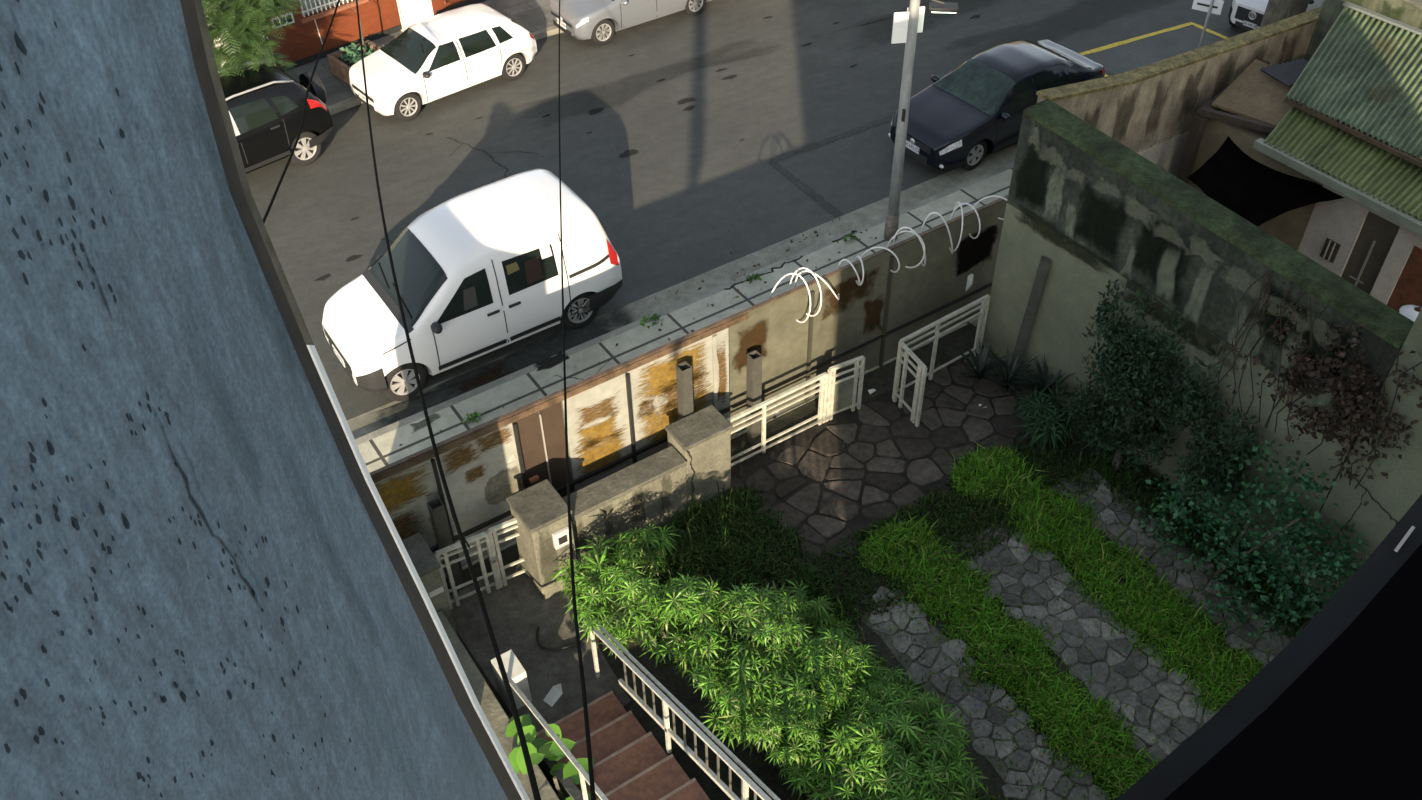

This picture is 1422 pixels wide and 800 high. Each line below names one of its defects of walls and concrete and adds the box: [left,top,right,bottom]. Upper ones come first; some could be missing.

crack [82,244,110,313]
corrosion [823,269,884,332]
corrosion [575,321,767,484]
crack [161,427,257,601]